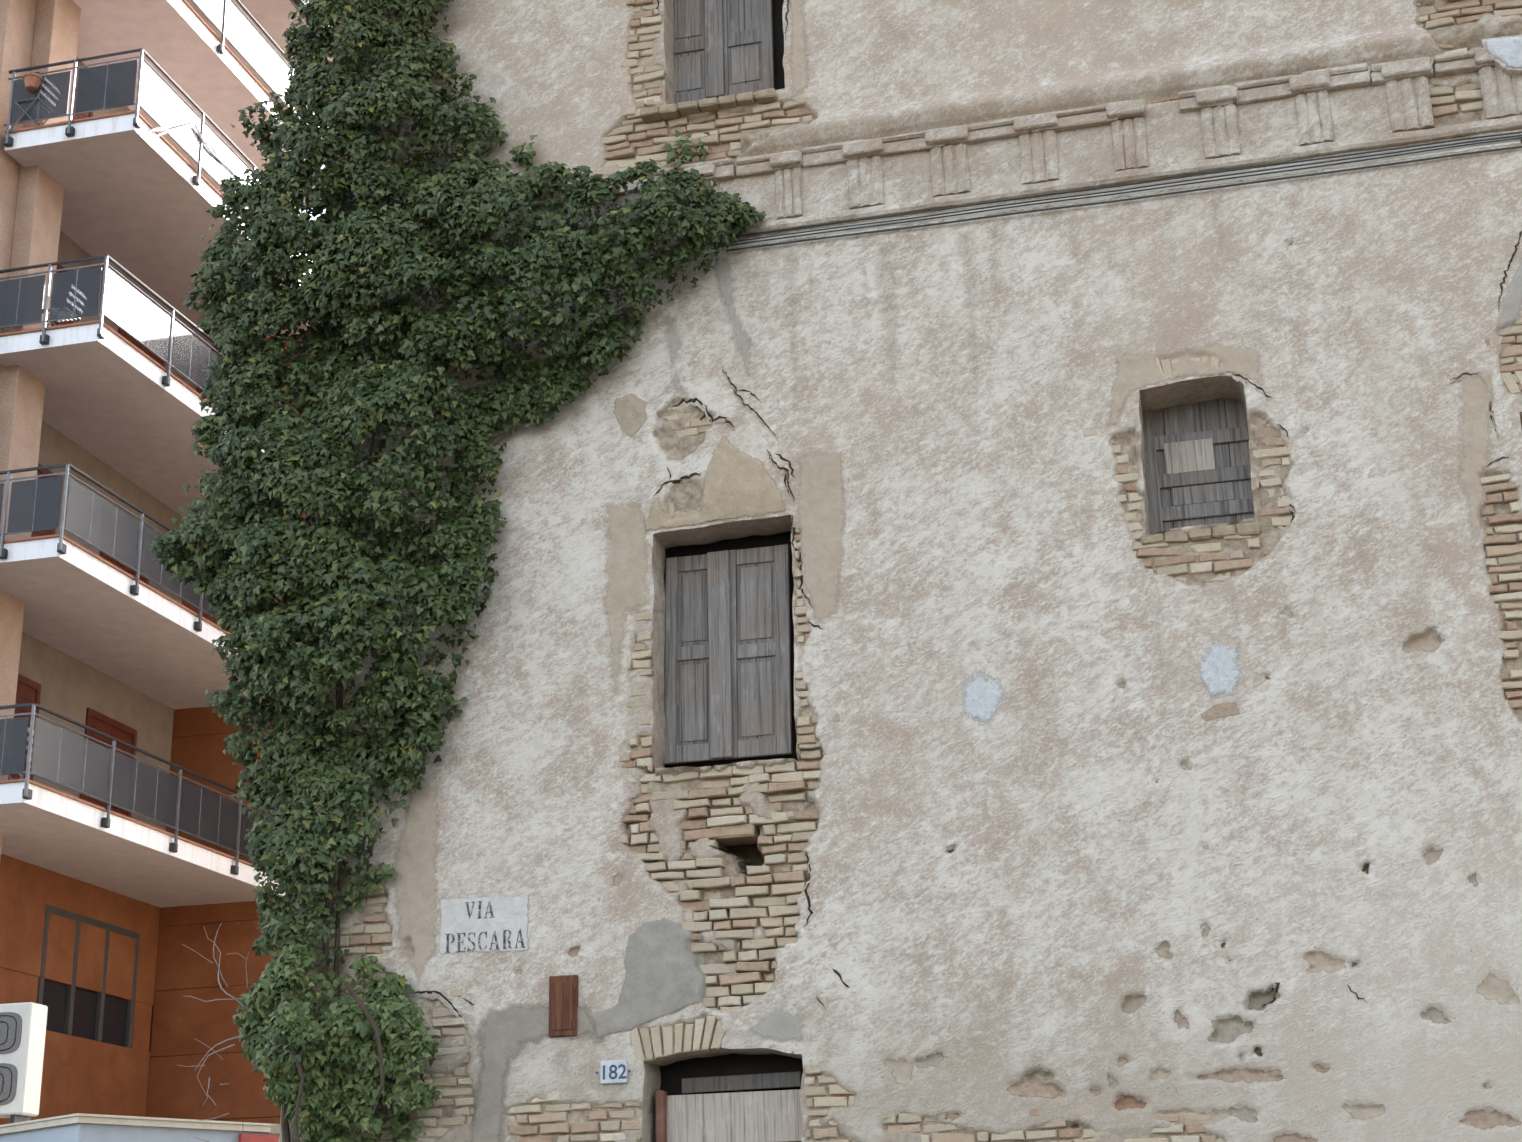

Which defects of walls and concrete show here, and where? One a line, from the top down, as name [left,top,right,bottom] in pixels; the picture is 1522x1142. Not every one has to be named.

flaking render [602,0,815,168]
crack [1498,231,1522,302]
flaking render [1484,317,1522,394]
crack [654,467,701,495]
crack [672,369,822,629]
flaking render [1083,420,1292,587]
flaking render [1480,473,1522,723]
flaking render [619,527,840,1063]
flaking render [330,988,475,1142]
flaking render [505,1092,641,1142]
flaking render [882,1057,1258,1142]
flaking render [1197,991,1284,1083]